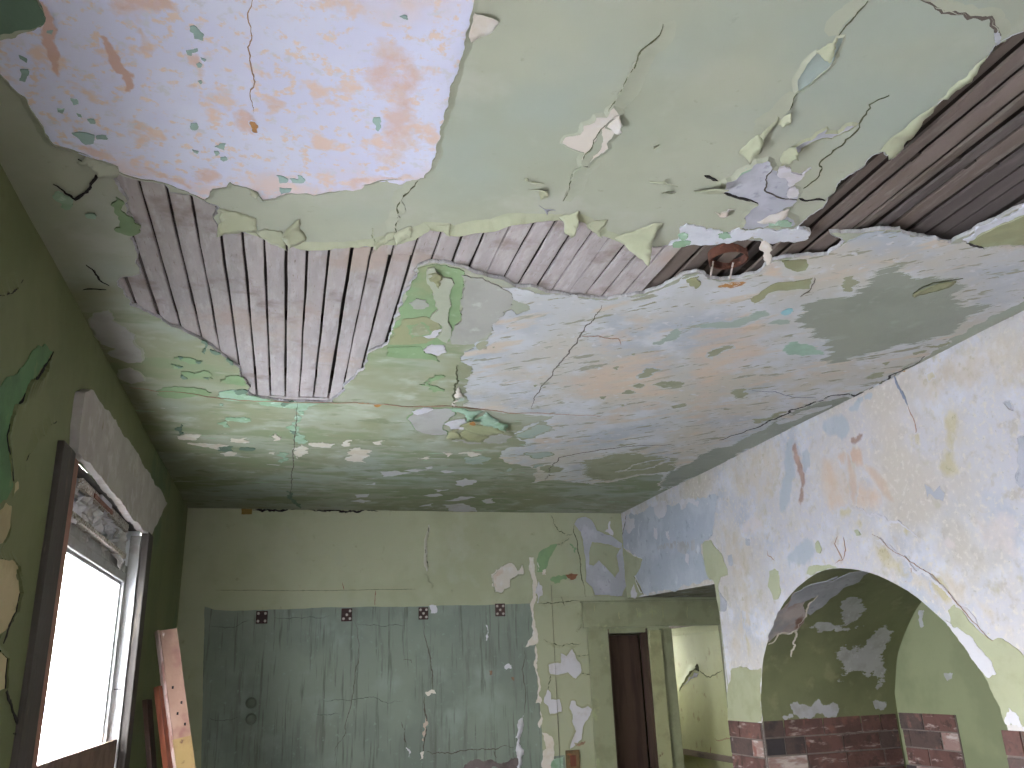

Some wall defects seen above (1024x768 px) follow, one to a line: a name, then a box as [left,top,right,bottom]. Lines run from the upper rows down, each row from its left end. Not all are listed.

crack [560,20,677,202]
crack [83,265,109,290]
crack [52,156,141,236]
flaking render [0,0,1024,512]
crack [130,366,595,513]
crack [657,356,925,491]
peeling [0,344,54,735]
peeling [461,544,592,768]
flaking render [570,494,718,599]
peeling [781,697,851,720]
flaking render [768,571,898,712]
crack [855,506,993,641]